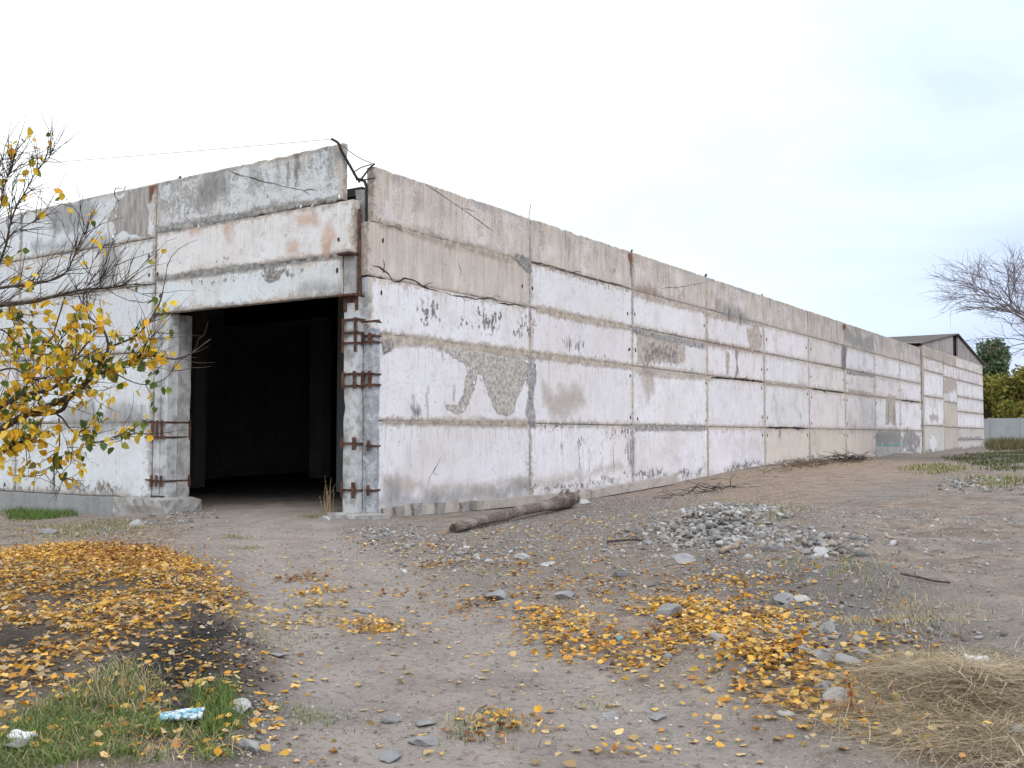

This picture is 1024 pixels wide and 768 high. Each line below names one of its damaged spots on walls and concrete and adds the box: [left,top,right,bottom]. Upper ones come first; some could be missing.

crack [372,258,527,308]
spalling [380,222,609,289]
peeling [626,290,762,351]
spalling [381,297,713,432]